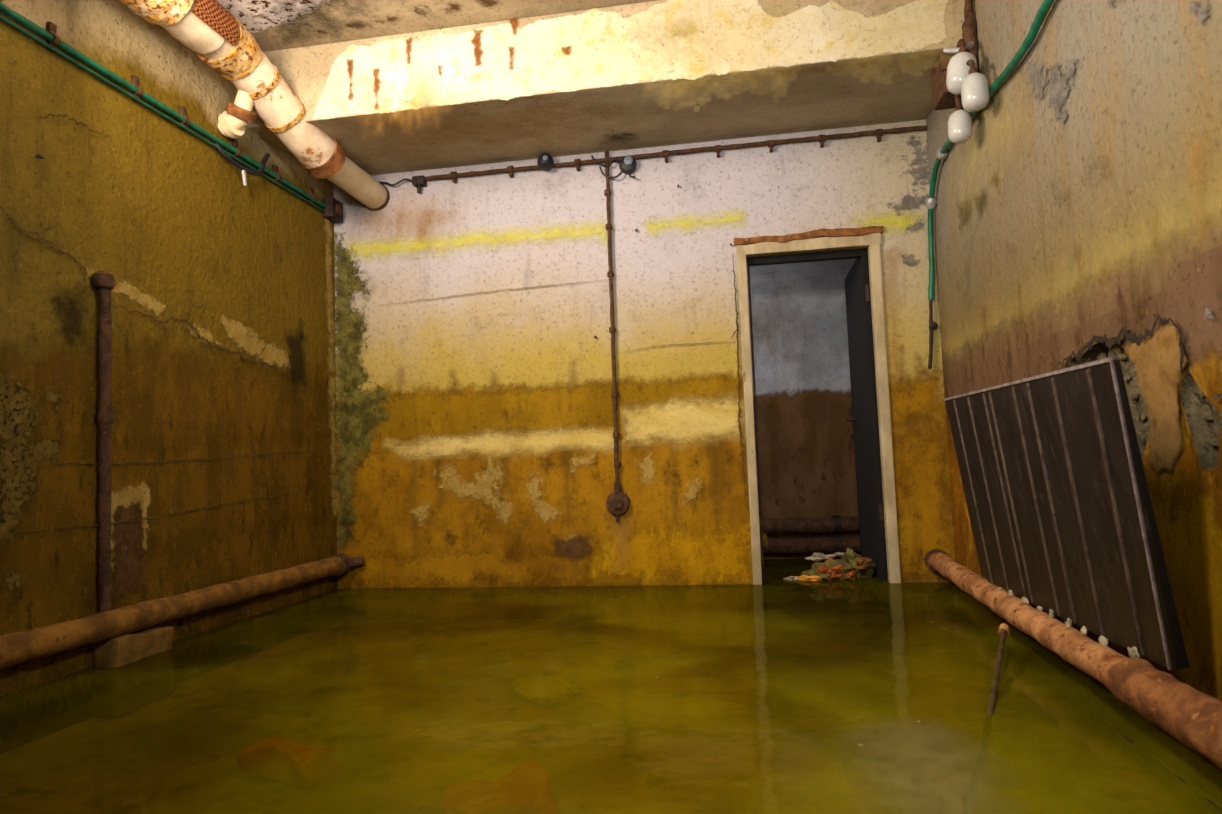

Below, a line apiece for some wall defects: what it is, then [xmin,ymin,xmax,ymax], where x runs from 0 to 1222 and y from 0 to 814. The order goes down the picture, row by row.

peeling [217,0,329,34]
corrosion [472,30,483,66]
corrosion [509,18,518,70]
crack [34,113,109,137]
corrosion [373,69,381,109]
crack [0,206,92,278]
crack [111,304,300,382]
leakage [0,218,861,641]
leakage [889,216,1222,702]
spalling [1064,343,1151,458]
spalling [1180,370,1222,470]
leakage [0,644,94,696]